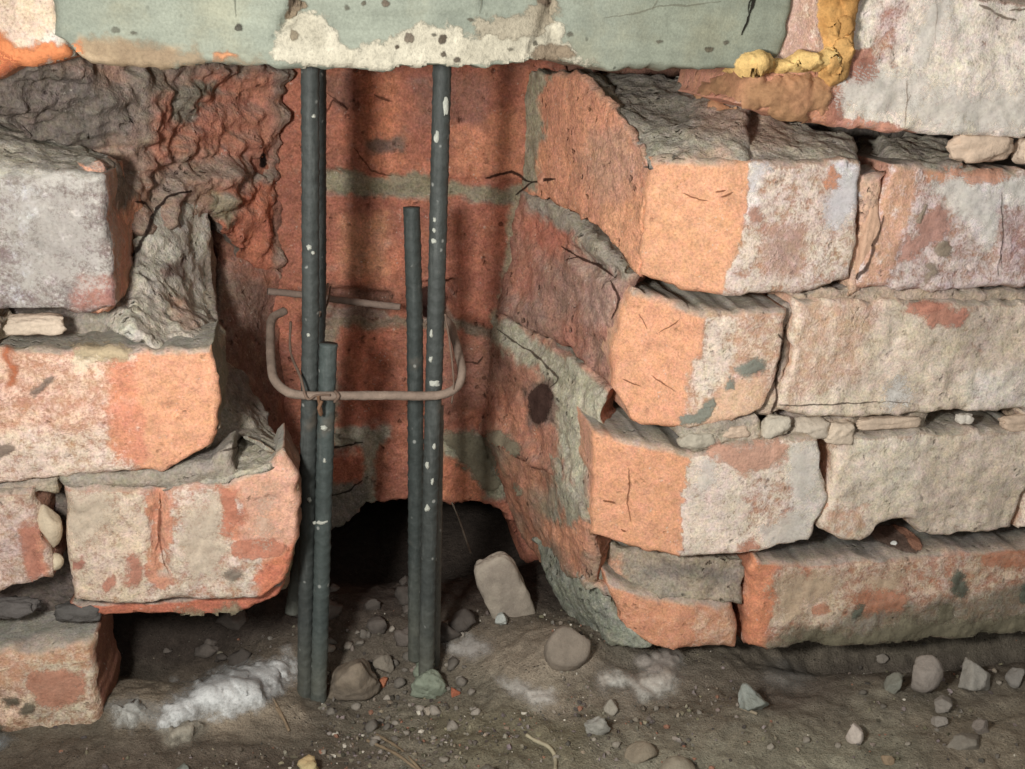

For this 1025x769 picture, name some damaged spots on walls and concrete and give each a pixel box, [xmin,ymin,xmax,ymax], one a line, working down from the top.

spalling [269,0,597,71]
crack [741,0,755,35]
crack [132,190,192,261]
spalling [527,383,553,424]
spalling [217,485,285,560]
spalling [20,527,41,582]
spalling [102,554,143,592]
spalling [26,669,85,710]
water stain [111,699,146,726]